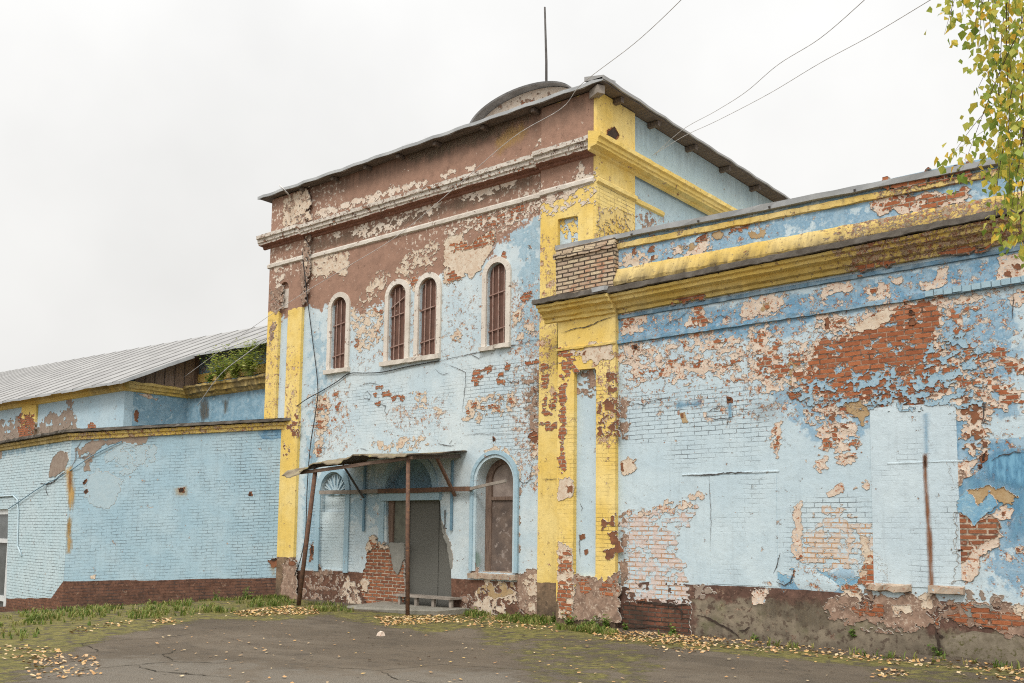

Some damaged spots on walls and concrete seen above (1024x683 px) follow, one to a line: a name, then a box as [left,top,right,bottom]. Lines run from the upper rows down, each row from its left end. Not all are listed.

spalling [869,158,976,217]
peeling [269,180,442,344]
flaking render [350,161,655,353]
rust [66,467,74,508]
peeling [0,399,157,509]
spalling [313,391,341,458]
flaking render [369,435,429,452]
spalling [373,385,443,416]
spalling [461,243,1024,639]
rust [923,455,933,585]
spalling [268,534,405,604]